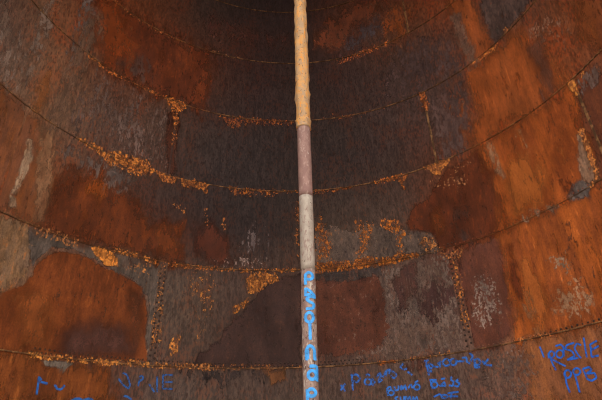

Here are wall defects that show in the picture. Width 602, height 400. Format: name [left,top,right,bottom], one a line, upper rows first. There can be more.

rust [314,0,412,64]
rust [0,86,302,400]
peeling [314,142,506,362]
rust [314,27,602,400]